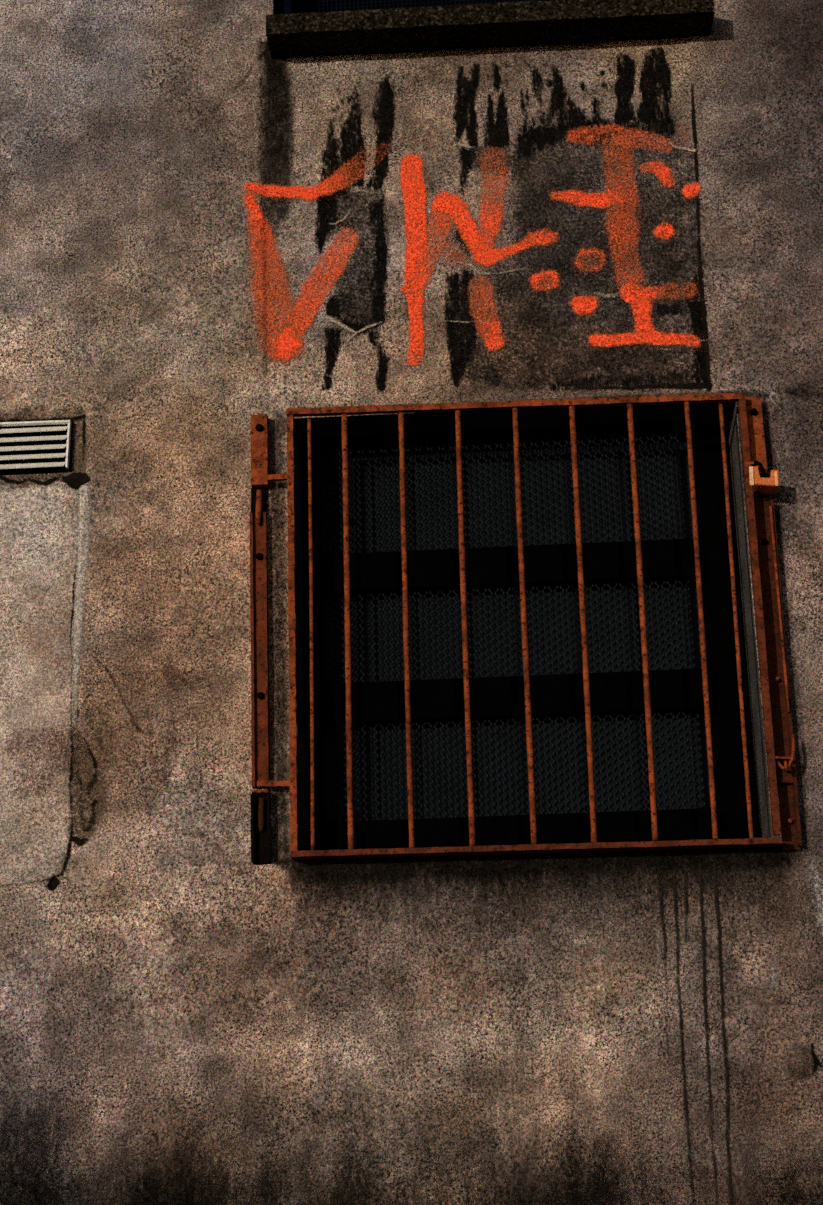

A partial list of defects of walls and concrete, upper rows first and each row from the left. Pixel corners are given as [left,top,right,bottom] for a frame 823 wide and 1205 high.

crack [6,519,141,886]
water stain [270,433,794,1205]
water stain [809,859,823,930]
water stain [125,1150,225,1205]